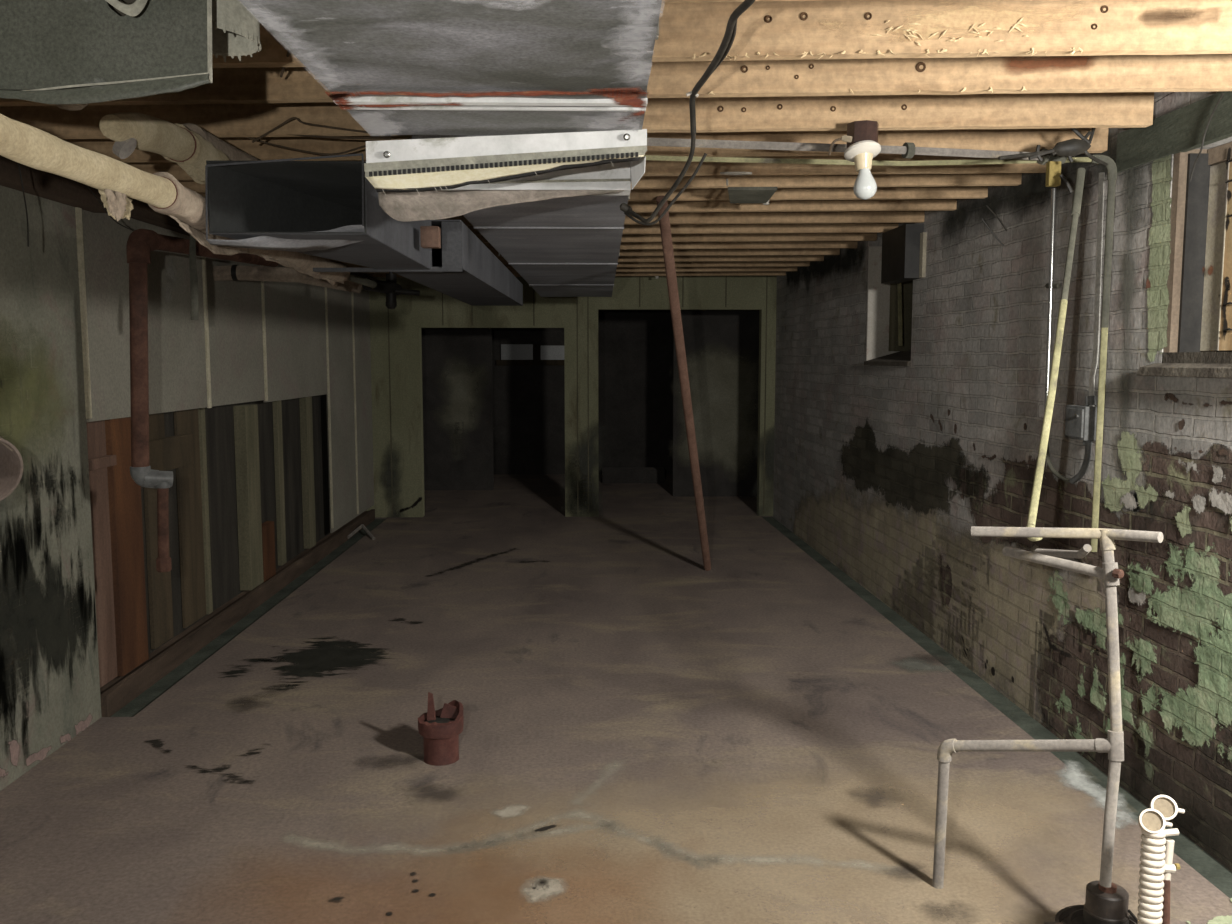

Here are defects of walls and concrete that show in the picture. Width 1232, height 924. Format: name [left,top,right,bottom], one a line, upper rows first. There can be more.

corrosion [325,88,648,121]
damp [0,464,97,757]
damp [218,636,387,690]
flaking render [841,409,1232,829]
crack [289,764,873,867]
flaking render [1170,819,1217,860]